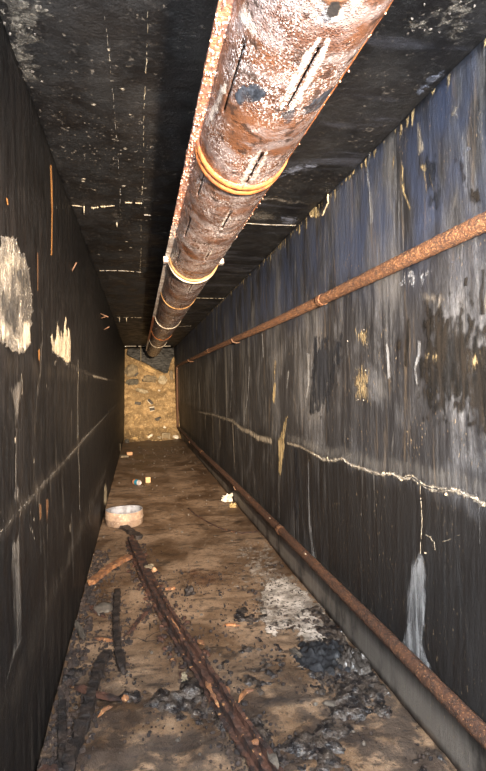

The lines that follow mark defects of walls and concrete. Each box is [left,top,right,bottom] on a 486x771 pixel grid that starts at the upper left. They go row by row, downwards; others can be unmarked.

flaking render [0,236,33,354]
spalling [51,317,71,365]
water stain [404,557,429,668]